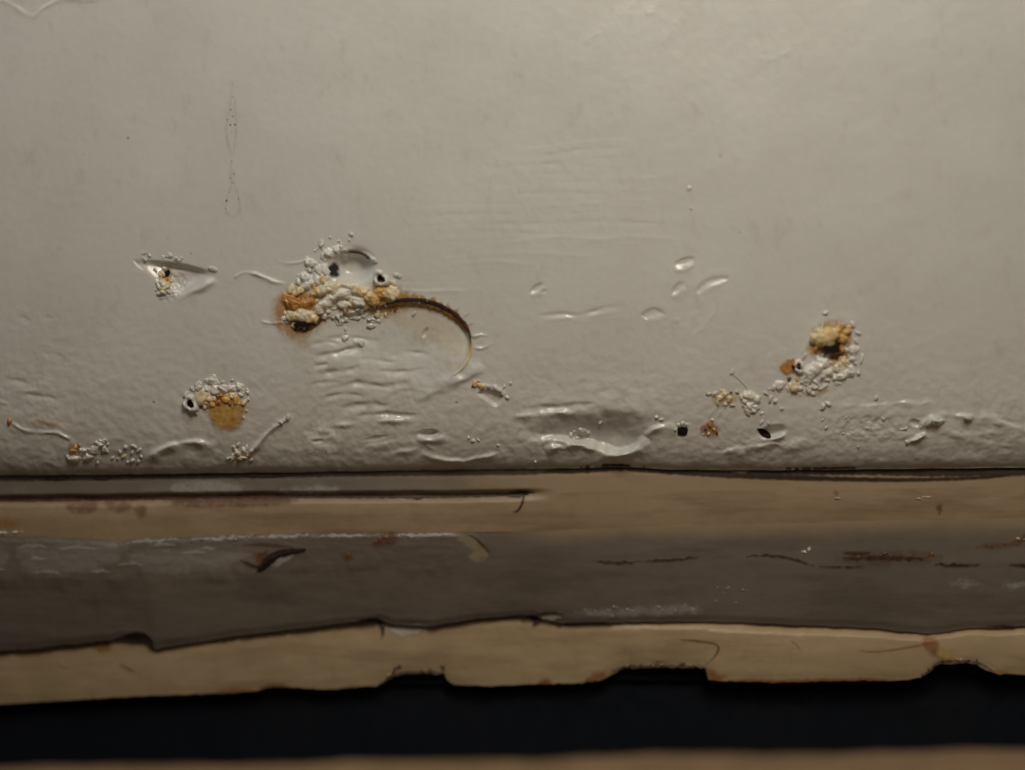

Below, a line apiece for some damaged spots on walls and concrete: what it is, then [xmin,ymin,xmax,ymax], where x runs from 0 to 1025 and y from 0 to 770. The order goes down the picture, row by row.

corrosion [701,418,718,436]
peeling [378,664,457,687]
peeling [600,662,723,683]
peeling [921,658,1007,678]